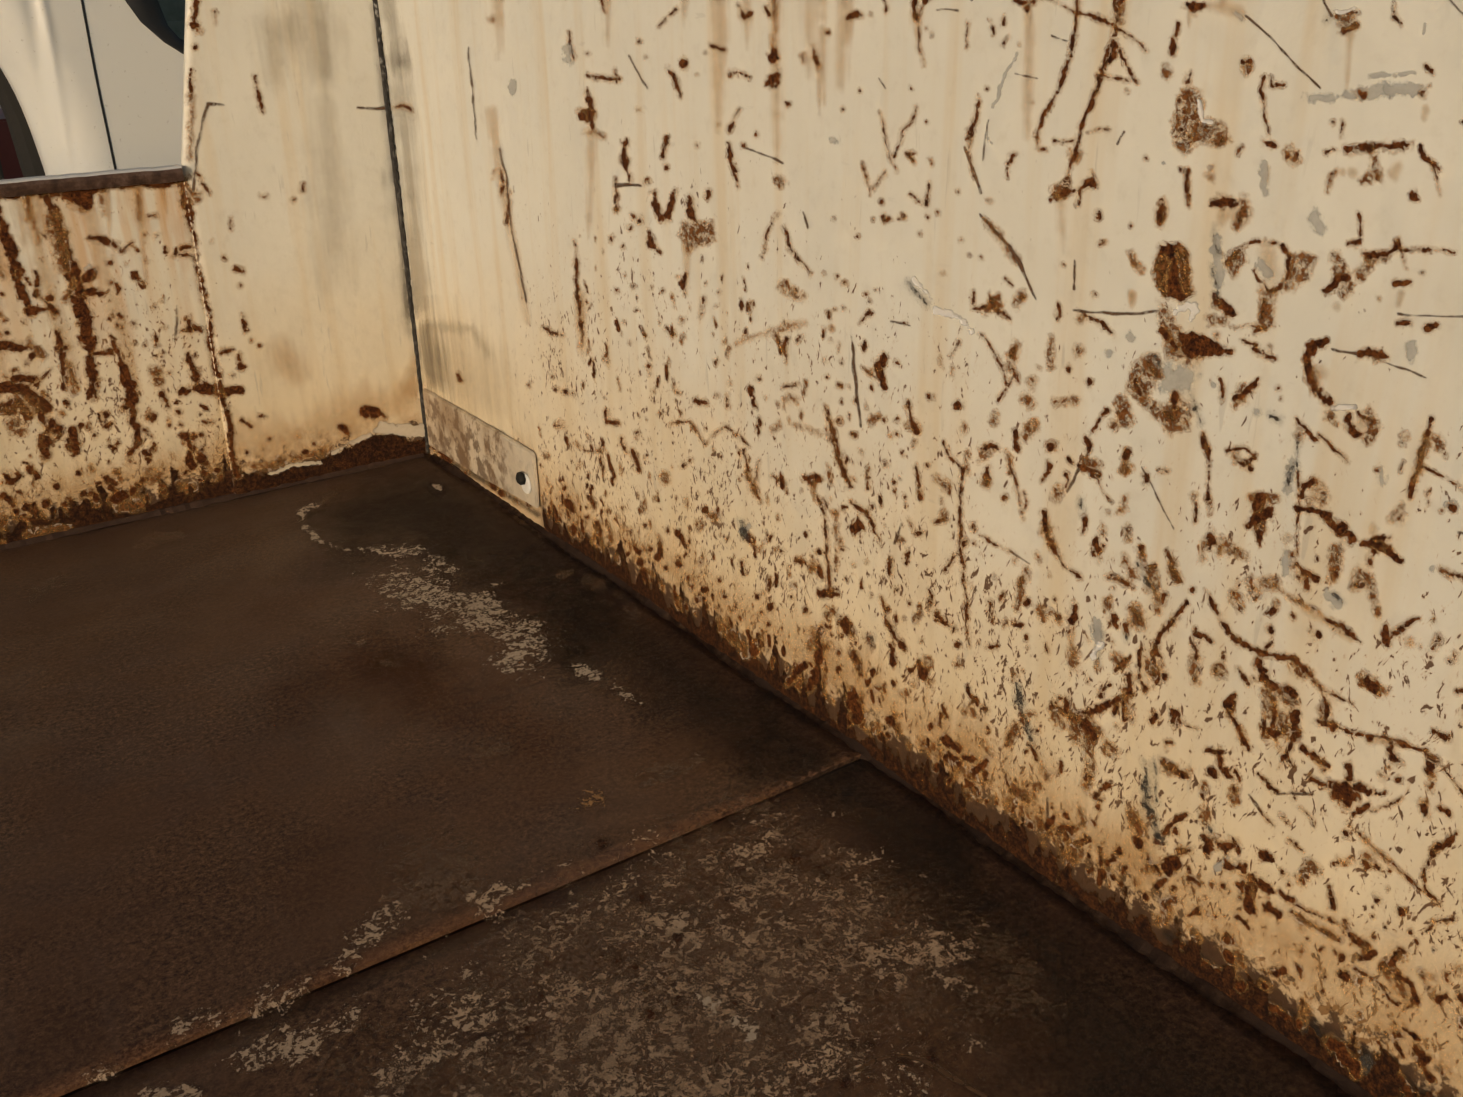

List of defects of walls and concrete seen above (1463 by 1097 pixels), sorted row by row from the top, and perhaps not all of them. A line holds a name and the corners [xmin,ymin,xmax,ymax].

corrosion [764,0,791,106]
corrosion [1048,151,1099,206]
corrosion [1171,87,1228,172]
corrosion [1343,140,1410,185]
corrosion [551,135,731,431]
corrosion [971,277,1026,320]
corrosion [766,340,920,536]
corrosion [985,334,1093,475]
corrosion [1063,194,1379,548]
corrosion [988,554,1082,670]
corrosion [1187,627,1402,838]
corrosion [1419,729,1451,818]